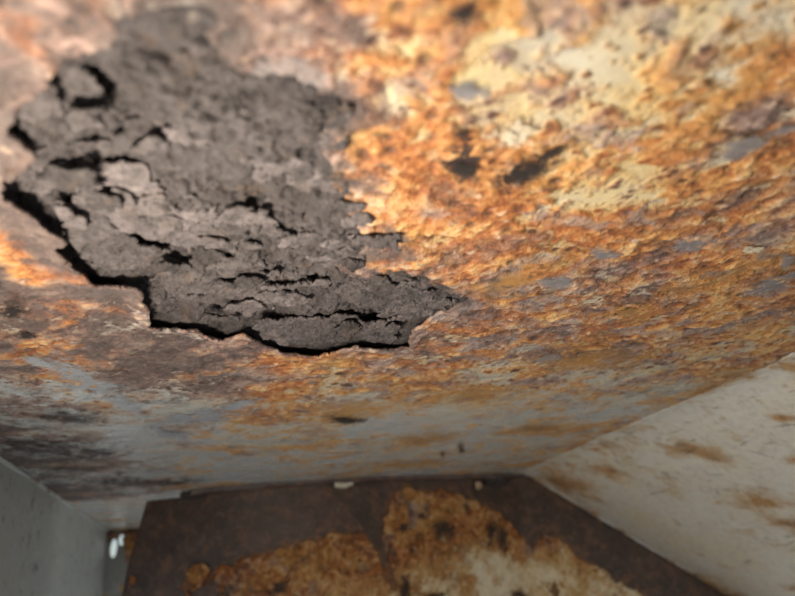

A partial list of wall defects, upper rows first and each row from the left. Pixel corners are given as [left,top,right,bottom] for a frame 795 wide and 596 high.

rust [443,1,479,26]
rust [437,131,564,189]
rust [19,409,105,424]